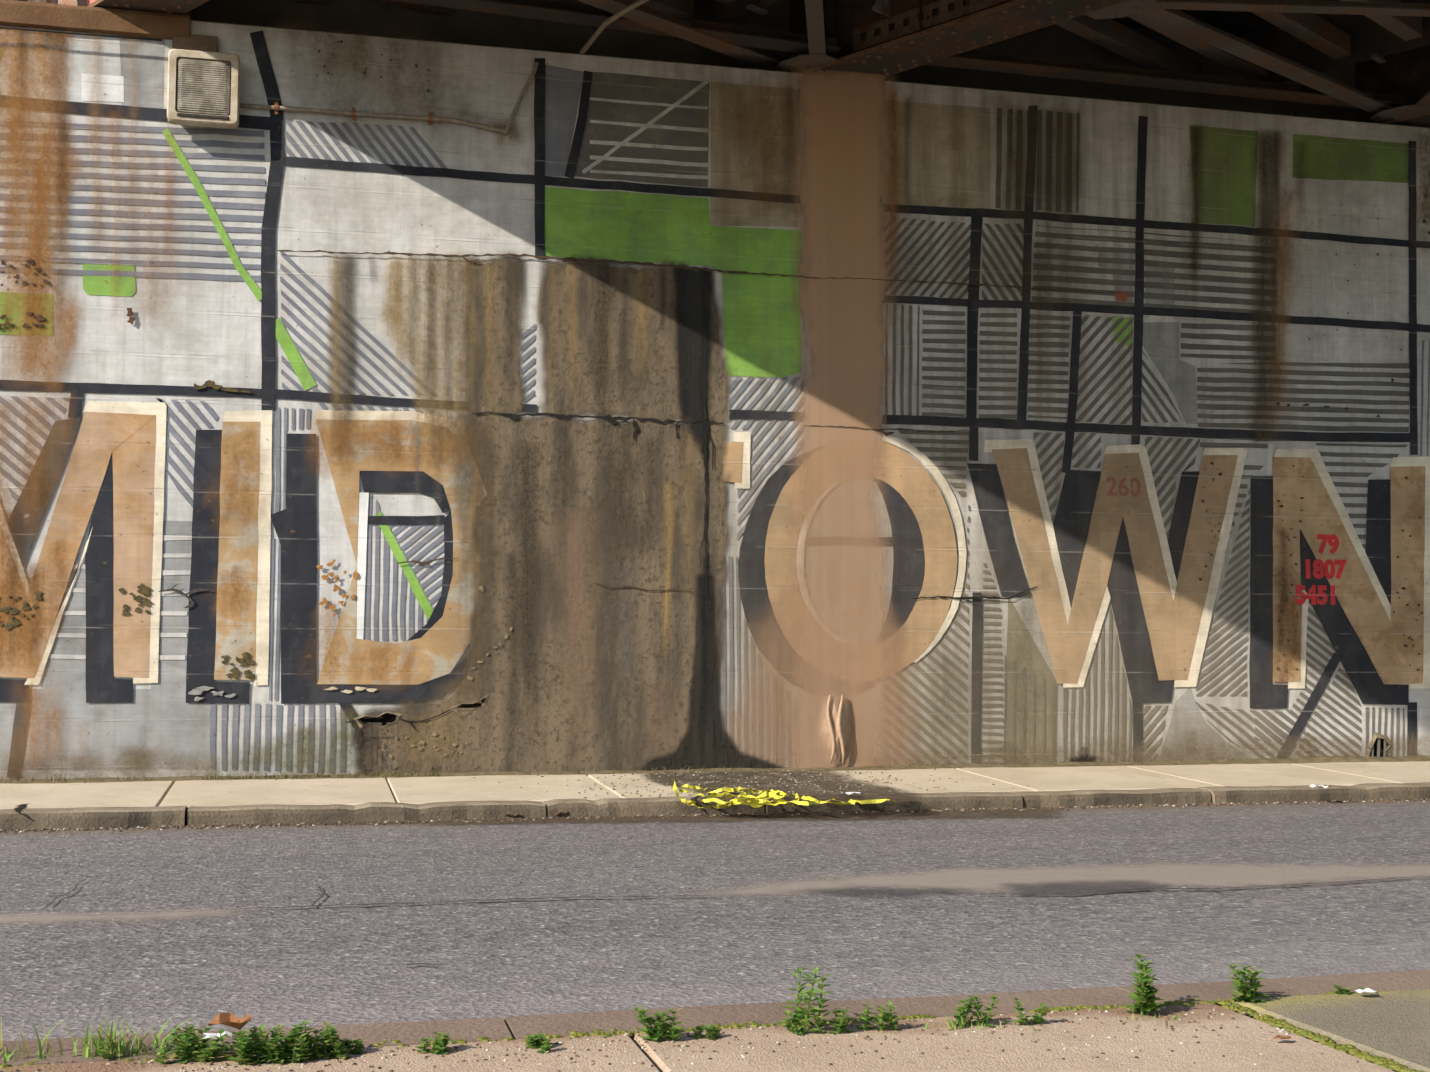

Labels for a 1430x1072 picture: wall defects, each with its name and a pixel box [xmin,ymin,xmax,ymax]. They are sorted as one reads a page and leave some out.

rust [0,29,77,385]
water stain [330,260,354,450]
water stain [383,257,492,566]
peeling [353,255,728,774]
crack [473,394,724,596]
crack [804,425,963,436]
crack [912,586,1038,604]
water stain [1254,134,1280,438]